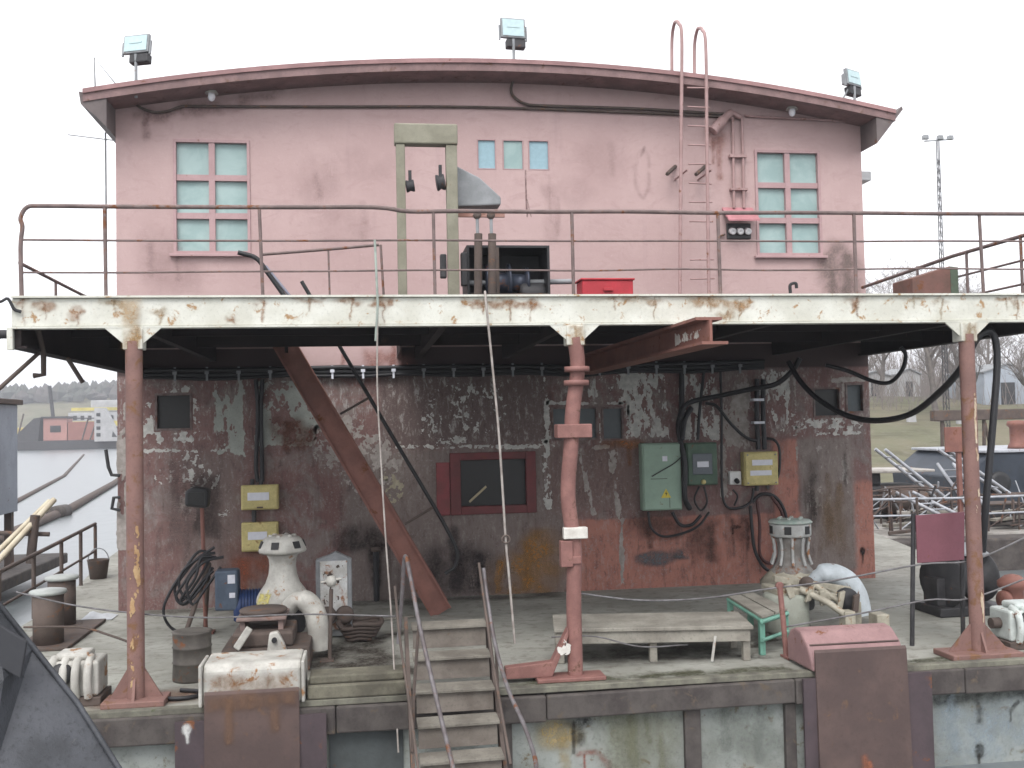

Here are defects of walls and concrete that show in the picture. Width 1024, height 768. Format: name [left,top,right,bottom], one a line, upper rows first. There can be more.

rust [472,300,537,312]
rust [695,296,749,318]
peeling [143,385,220,521]
peeling [211,380,358,493]
peeling [342,383,566,510]
peeling [578,373,685,584]
peeling [684,369,865,508]